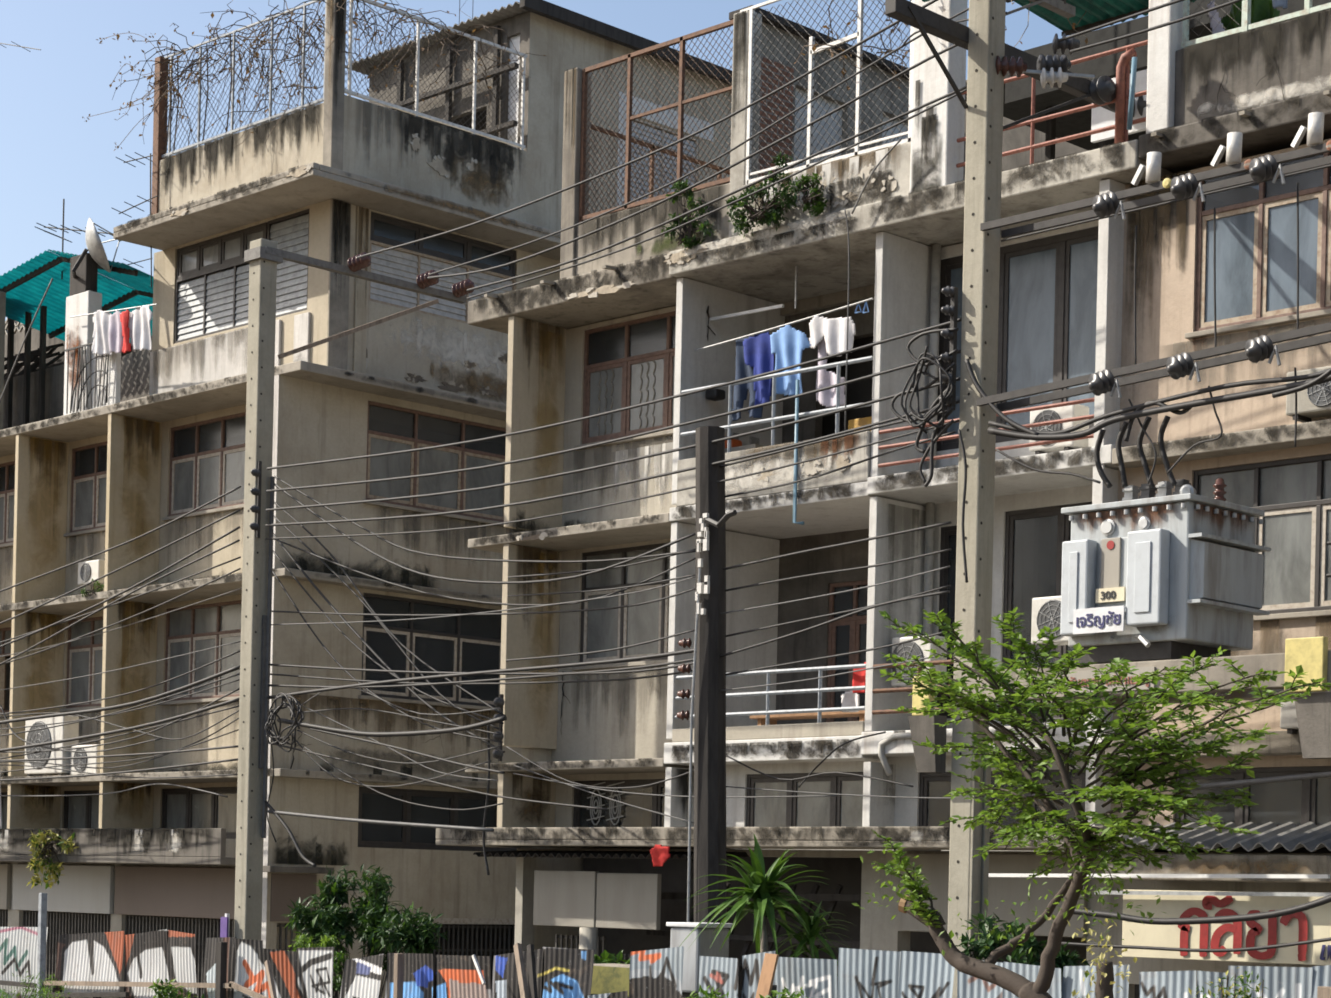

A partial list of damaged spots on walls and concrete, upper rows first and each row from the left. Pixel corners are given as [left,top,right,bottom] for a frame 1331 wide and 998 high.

leakage [336,0,346,73]
leakage [1183,8,1331,137]
leakage [117,165,299,236]
leakage [164,103,320,188]
leakage [385,111,525,227]
leakage [474,80,965,361]
leakage [1127,170,1188,297]
leakage [401,320,507,406]
leakage [474,516,614,590]
leakage [0,573,242,639]
leakage [0,828,210,853]
leakage [726,826,950,846]